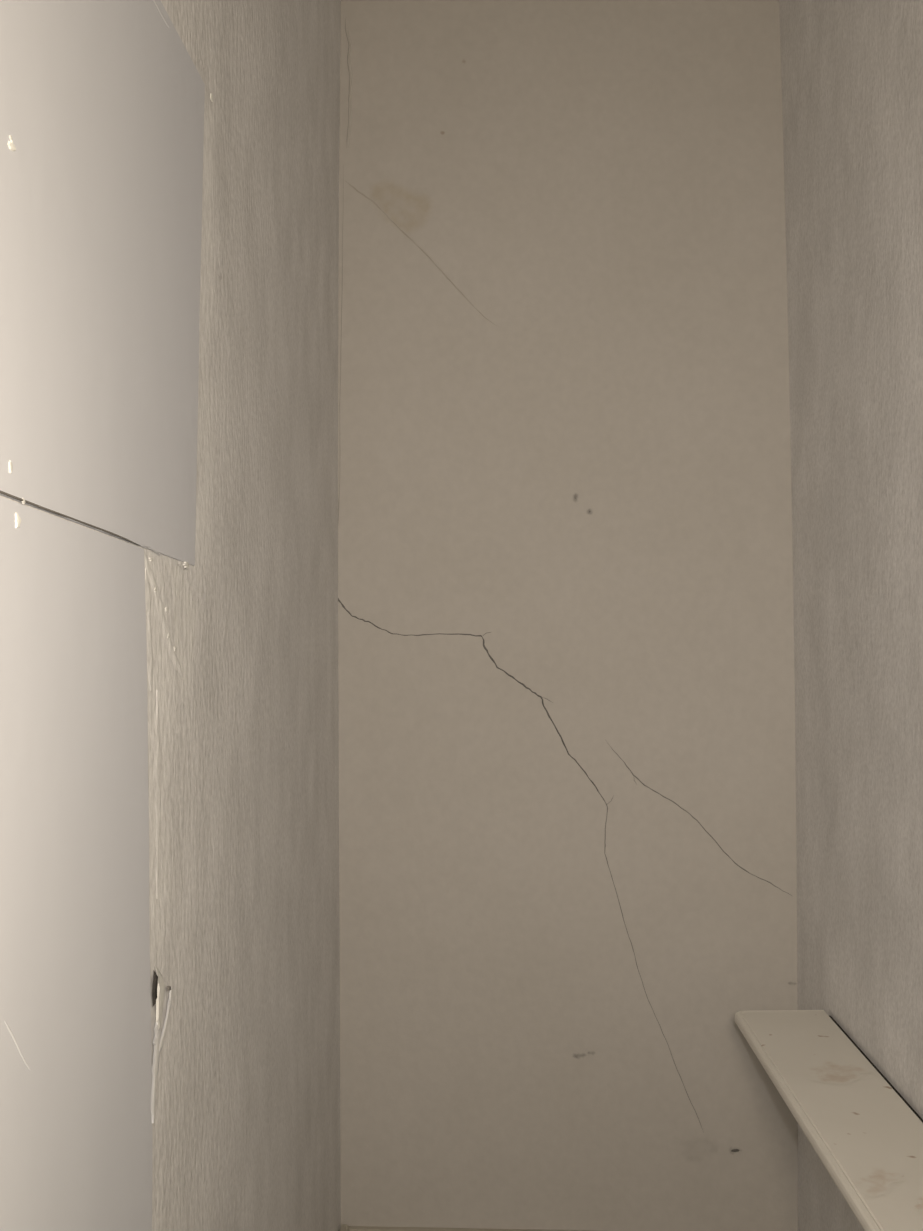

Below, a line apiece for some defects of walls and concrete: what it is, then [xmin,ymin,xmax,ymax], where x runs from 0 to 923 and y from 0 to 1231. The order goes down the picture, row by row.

crack [338,598,792,1133]